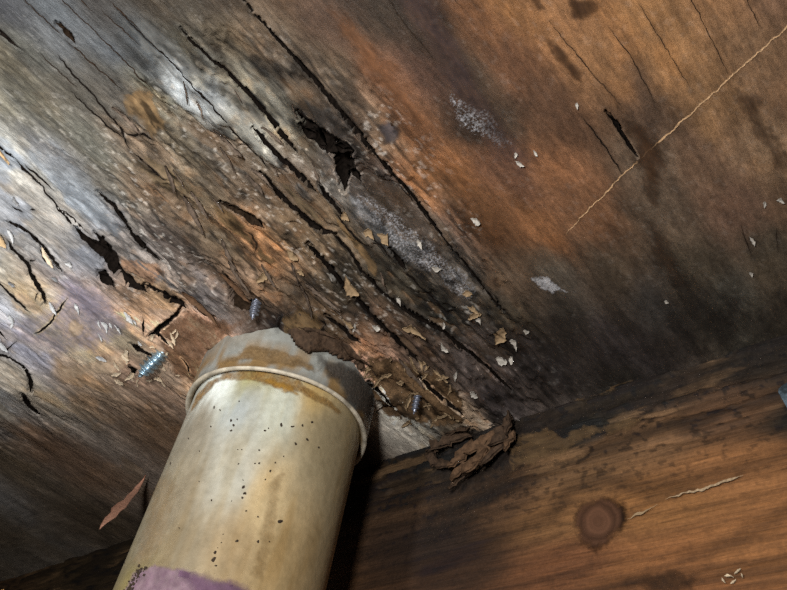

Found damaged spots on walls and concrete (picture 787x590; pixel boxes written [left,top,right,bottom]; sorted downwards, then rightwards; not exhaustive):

crack [25,1,162,179]
leakage [380,122,398,143]
leakage [453,100,508,144]
crack [0,146,88,334]
peeling [138,159,275,288]
crack [62,0,512,415]
leakage [356,196,477,299]
crack [0,331,40,414]
peeling [60,309,233,388]
rust [191,346,339,412]
peeling [358,350,478,428]
peeling [494,327,517,366]